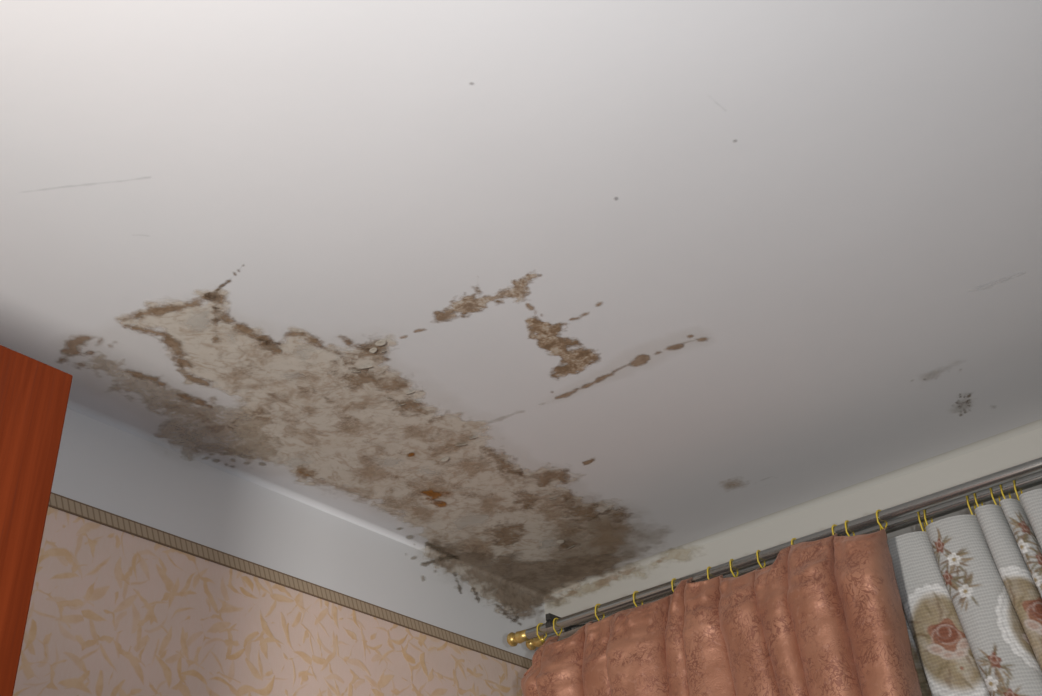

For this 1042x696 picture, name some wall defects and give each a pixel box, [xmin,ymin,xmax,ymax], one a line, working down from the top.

damp [59,336,100,362]
damp [630,335,706,366]
damp [119,274,627,625]